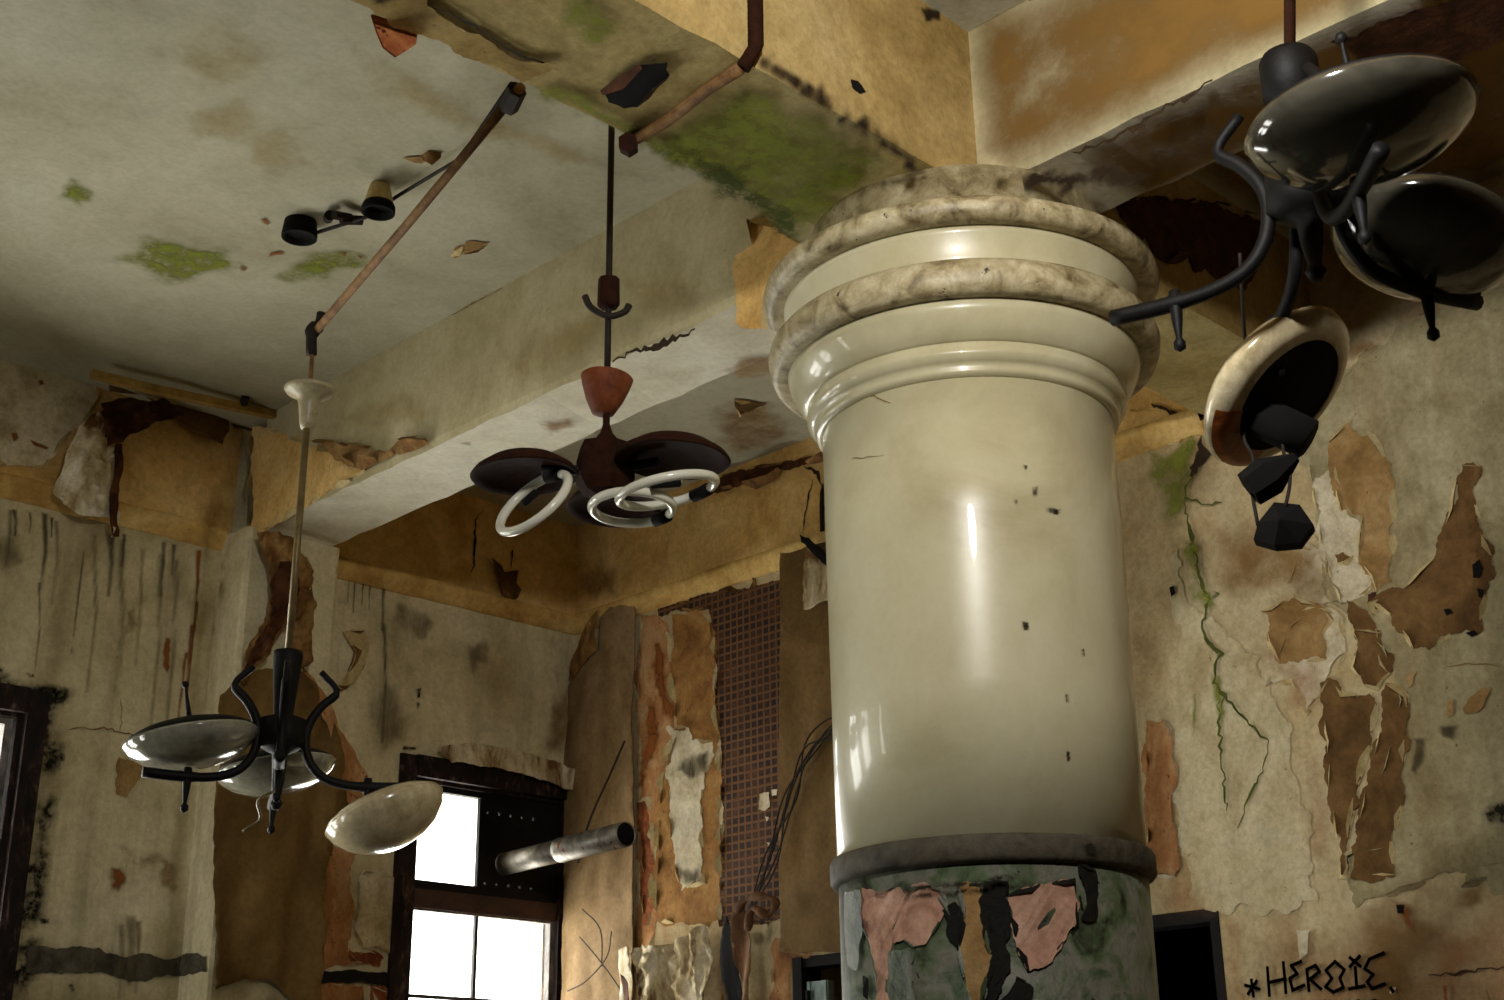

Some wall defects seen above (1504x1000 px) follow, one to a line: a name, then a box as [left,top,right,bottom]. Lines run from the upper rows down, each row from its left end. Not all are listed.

peeling [352,0,557,82]
peeling [1331,0,1504,62]
spalling [600,63,670,109]
leakage [540,87,872,237]
leakage [64,186,89,202]
leakage [124,243,229,280]
leakage [280,252,360,280]
peeling [732,218,800,330]
leakage [0,510,58,569]
leakage [1229,544,1311,584]
peeling [1141,283,1504,960]
spalling [634,578,1098,1000]